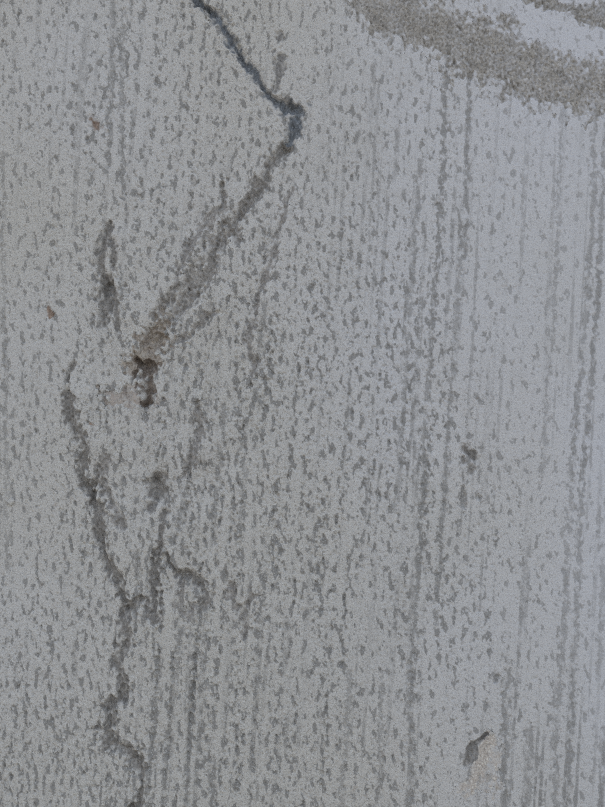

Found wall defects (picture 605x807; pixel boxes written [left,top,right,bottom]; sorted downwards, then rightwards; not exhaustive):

crack [88,220,129,340]
crack [148,0,313,389]
crack [60,357,262,807]